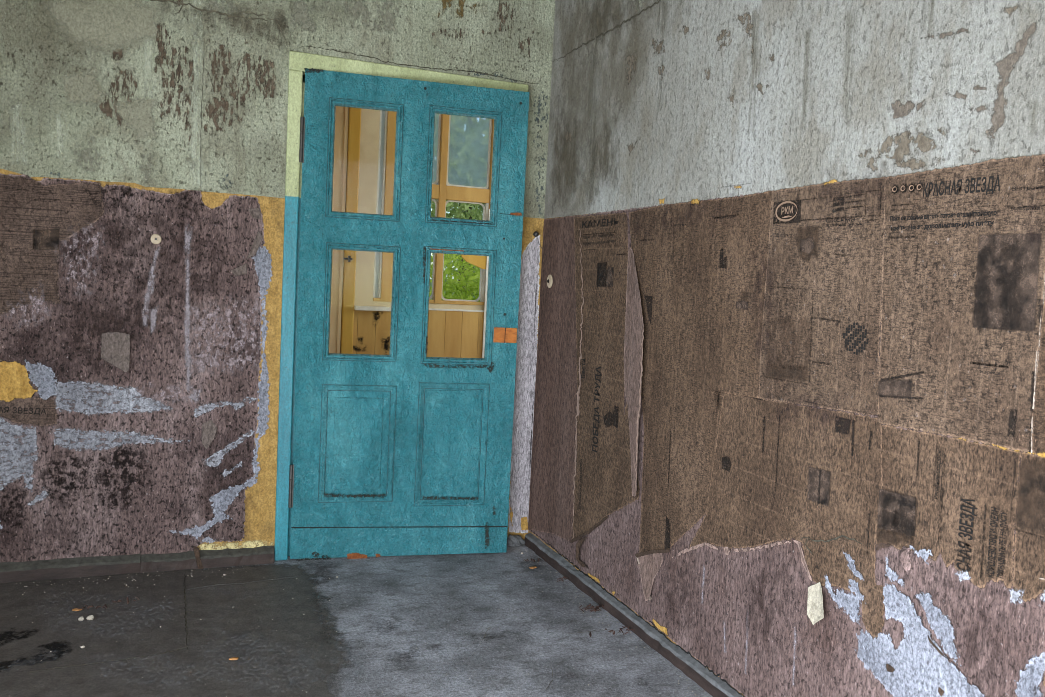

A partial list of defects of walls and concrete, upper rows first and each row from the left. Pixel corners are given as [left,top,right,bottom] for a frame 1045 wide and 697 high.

crack [198,59,206,184]
peeling [154,24,276,165]
crack [150,0,545,86]
crack [553,0,660,62]
peeling [858,127,950,174]
peeling [946,23,1036,139]
peeling [0,359,173,416]
peeling [169,208,273,550]
peeling [0,417,48,506]
peeling [52,428,189,451]
peeling [793,540,985,697]
peeling [1014,652,1045,697]